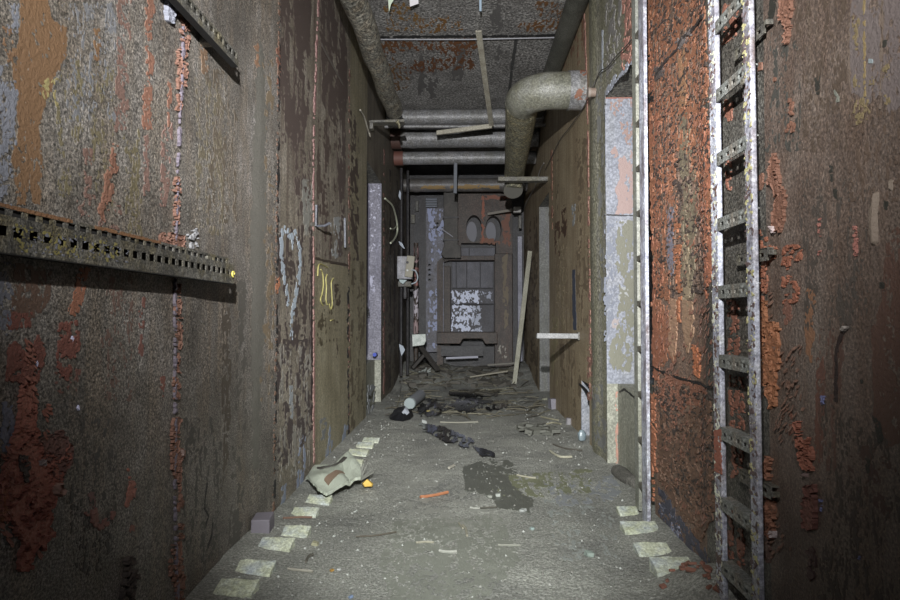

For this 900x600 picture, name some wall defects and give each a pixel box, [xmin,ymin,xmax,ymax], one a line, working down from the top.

corrosion [381,2,478,91]
peeling [605,0,633,215]
peeling [451,254,509,332]
corrosion [650,299,676,367]
damp [379,458,622,600]